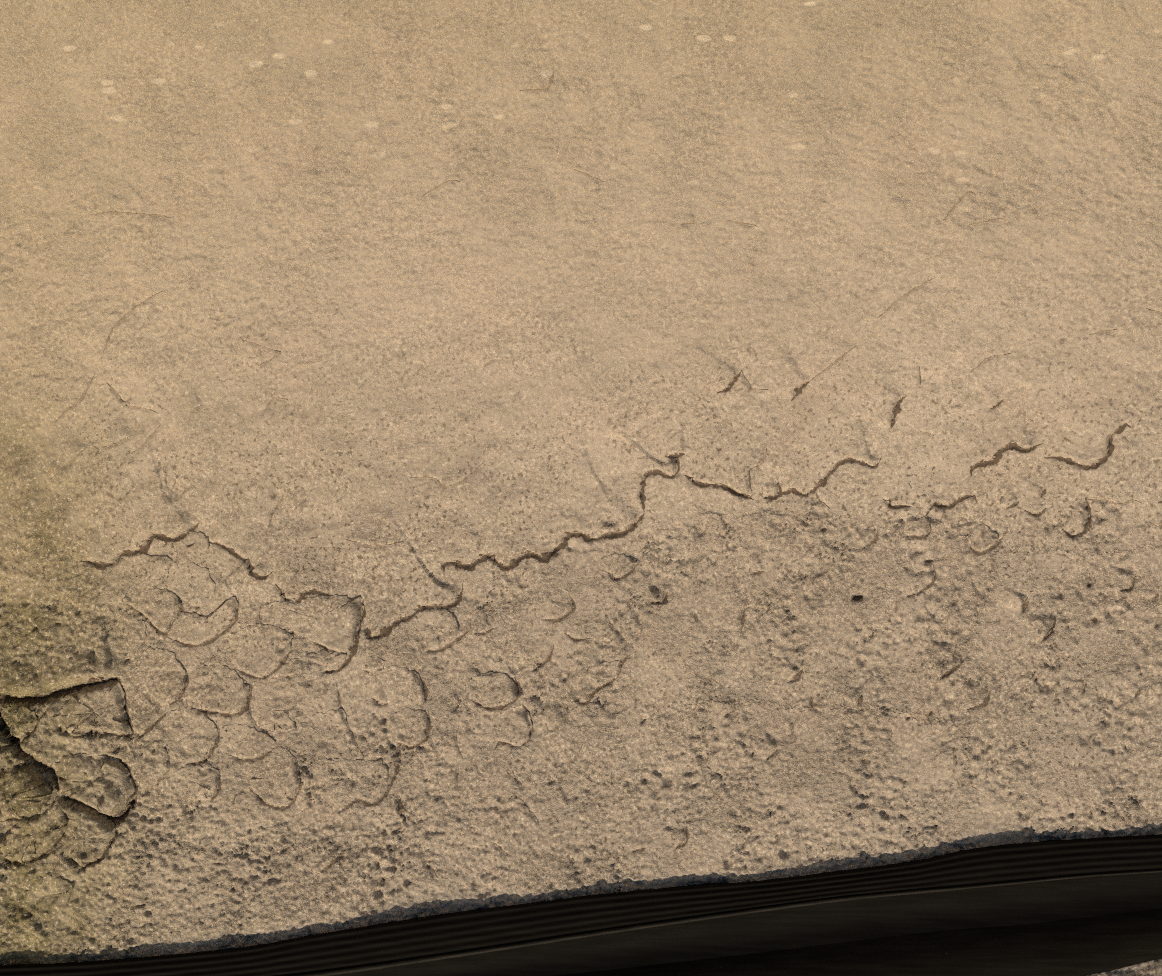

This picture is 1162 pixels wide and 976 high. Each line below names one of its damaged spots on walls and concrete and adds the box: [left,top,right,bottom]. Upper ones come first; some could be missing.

crack [80,523,330,605]
crack [268,498,307,526]
crack [365,450,882,640]
crack [883,423,1162,538]
crack [0,677,137,825]